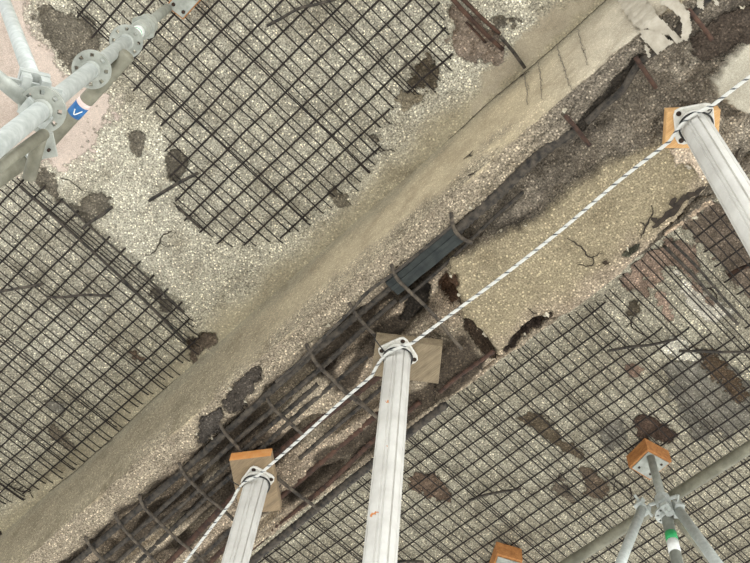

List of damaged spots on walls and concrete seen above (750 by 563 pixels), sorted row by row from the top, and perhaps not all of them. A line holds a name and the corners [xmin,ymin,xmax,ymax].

peeling [0,12,20,78]
peeling [58,84,90,114]
spalling [0,90,218,504]
spalling [122,0,522,248]
spalling [61,196,750,563]
crack [567,238,602,267]
spalling [464,0,750,237]
crack [640,187,705,239]